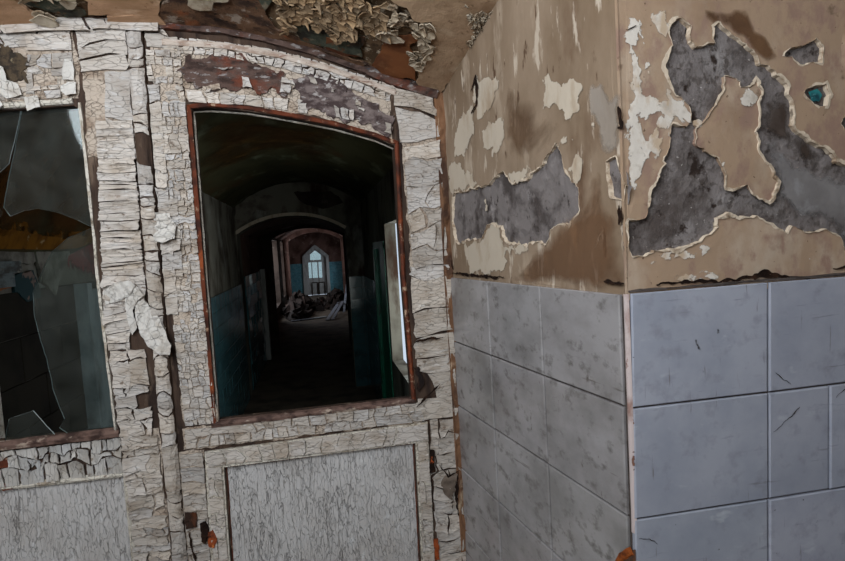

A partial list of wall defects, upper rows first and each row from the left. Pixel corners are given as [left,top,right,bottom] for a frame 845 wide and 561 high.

peeling [18,0,86,26]
peeling [158,0,436,81]
peeling [0,43,40,111]
peeling [60,59,76,96]
peeling [176,53,396,138]
leakage [510,108,529,147]
spalling [542,10,845,264]
spalling [448,75,582,275]
leakage [524,197,612,284]
crack [657,269,810,286]
rust [184,512,217,548]